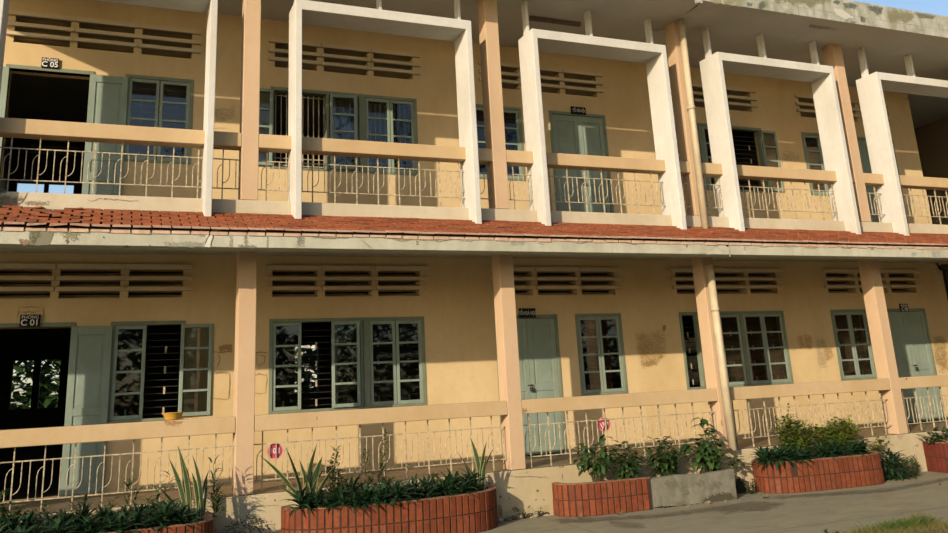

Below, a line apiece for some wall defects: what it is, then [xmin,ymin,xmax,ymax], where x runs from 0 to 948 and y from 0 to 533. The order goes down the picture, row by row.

mould [833,0,883,24]